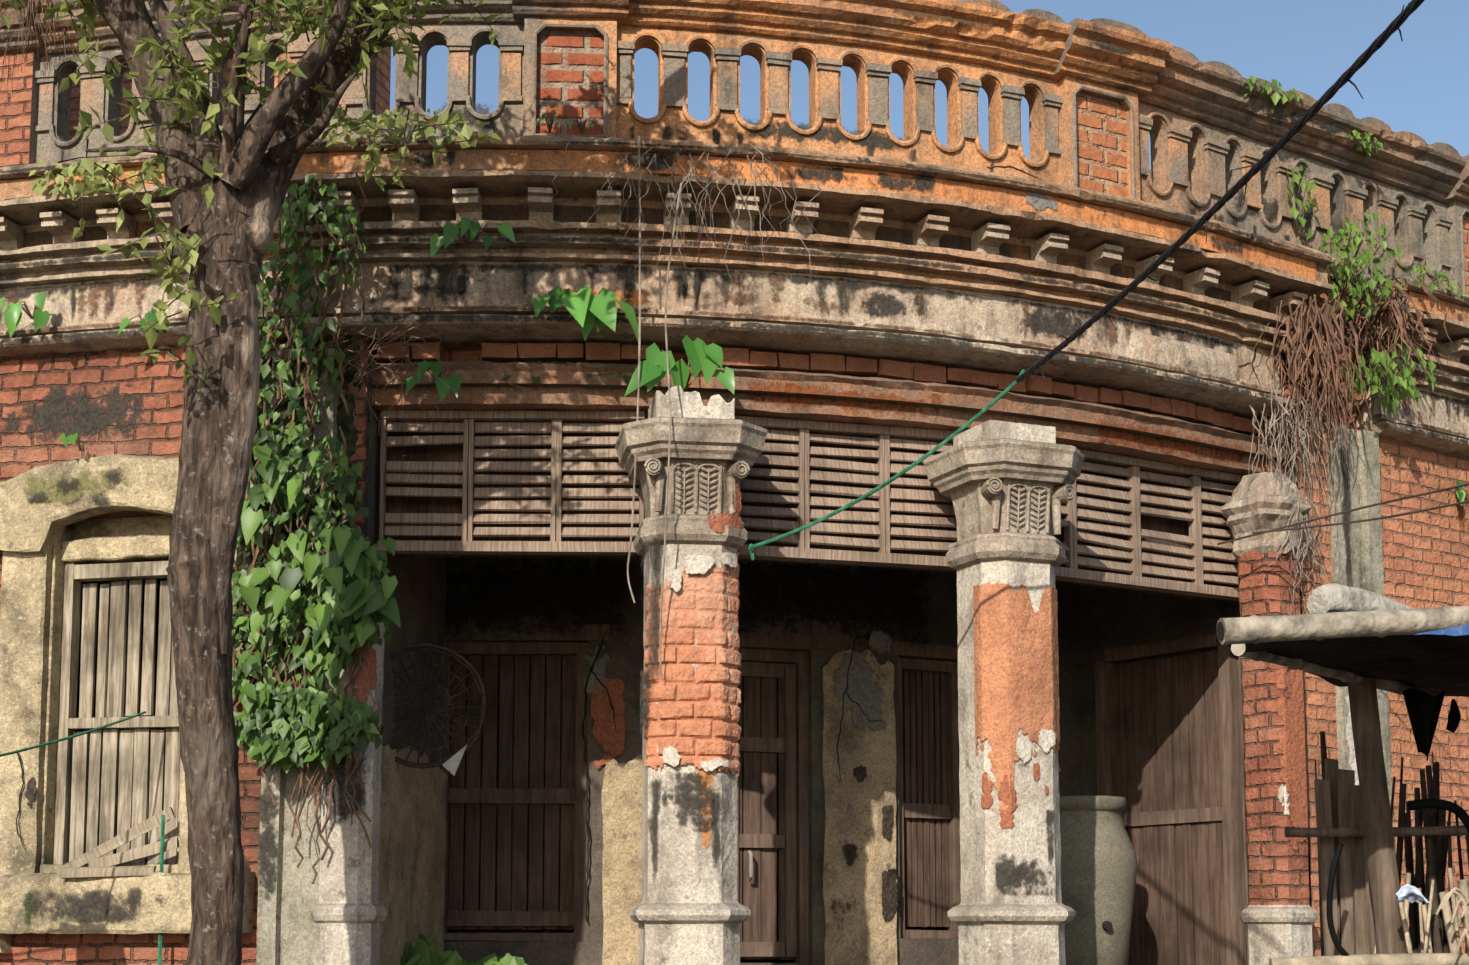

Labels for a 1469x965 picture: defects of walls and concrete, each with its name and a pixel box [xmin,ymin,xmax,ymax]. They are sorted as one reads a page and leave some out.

leakage [363,264,652,324]
leakage [685,241,969,271]
leakage [673,268,981,348]
leakage [3,384,146,442]
flaking render [583,484,742,776]
crack [836,642,887,779]
flaking render [973,582,1060,829]
leakage [648,772,720,872]
leakage [995,810,1055,895]
leakage [23,887,140,923]